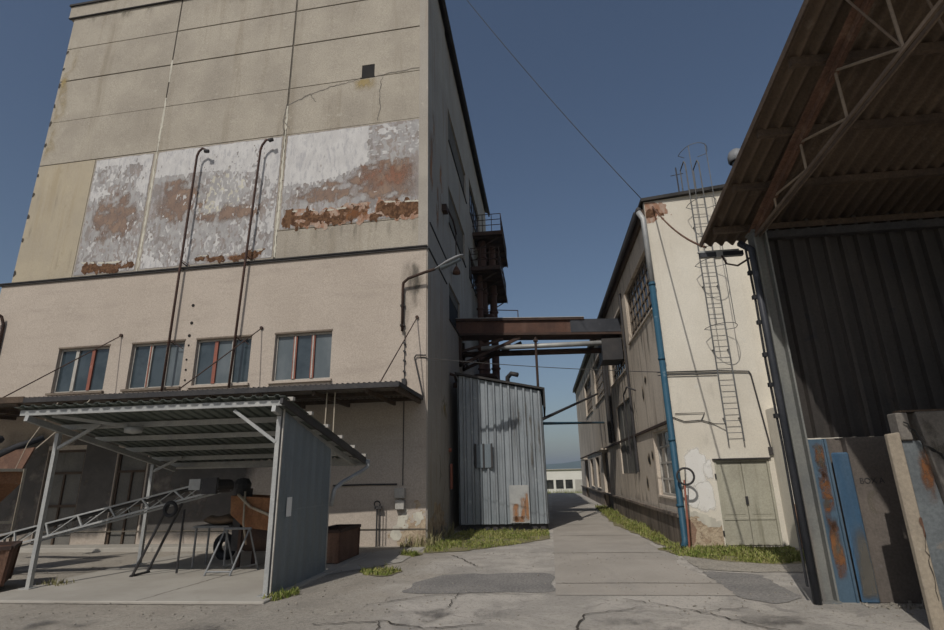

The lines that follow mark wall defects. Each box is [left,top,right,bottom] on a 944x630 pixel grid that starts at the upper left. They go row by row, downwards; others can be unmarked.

crack [283,67,419,136]
peeling [73,119,419,276]
spalling [388,500,447,546]
spalling [685,510,725,547]
crack [313,592,510,630]